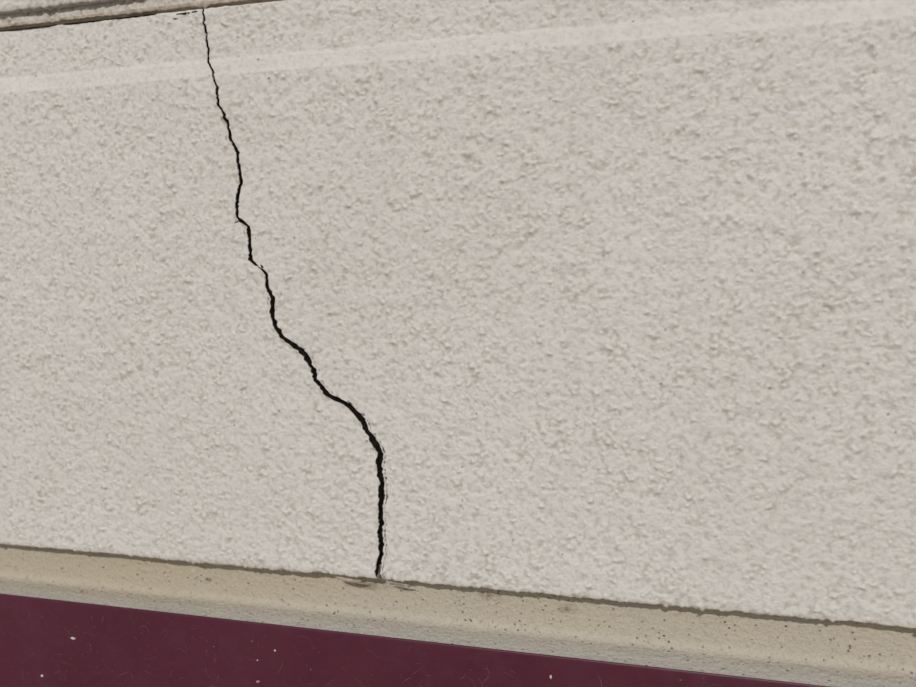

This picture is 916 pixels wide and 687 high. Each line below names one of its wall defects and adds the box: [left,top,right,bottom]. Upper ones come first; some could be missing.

crack [202,10,385,577]